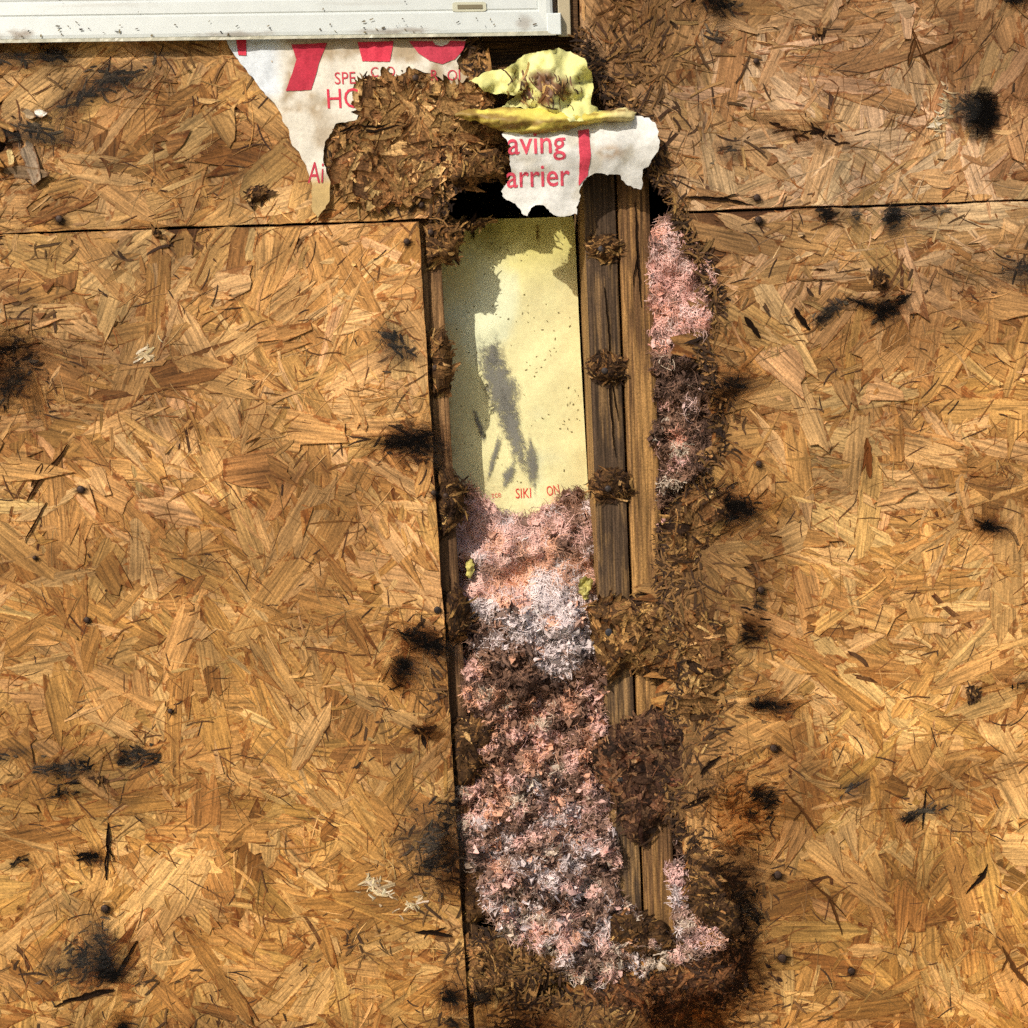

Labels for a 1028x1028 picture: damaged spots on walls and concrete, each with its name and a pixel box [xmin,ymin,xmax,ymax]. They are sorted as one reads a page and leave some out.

spalling [21,108,47,119]
spalling [0,120,50,186]
water stain [812,293,912,327]
water stain [133,336,162,364]
peeling [474,342,538,487]
water stain [373,424,446,460]
peeling [738,599,771,645]
water stain [31,754,94,801]
water stain [116,743,161,769]
peeling [743,783,783,823]
water stain [54,905,129,987]
peeling [704,846,782,1020]